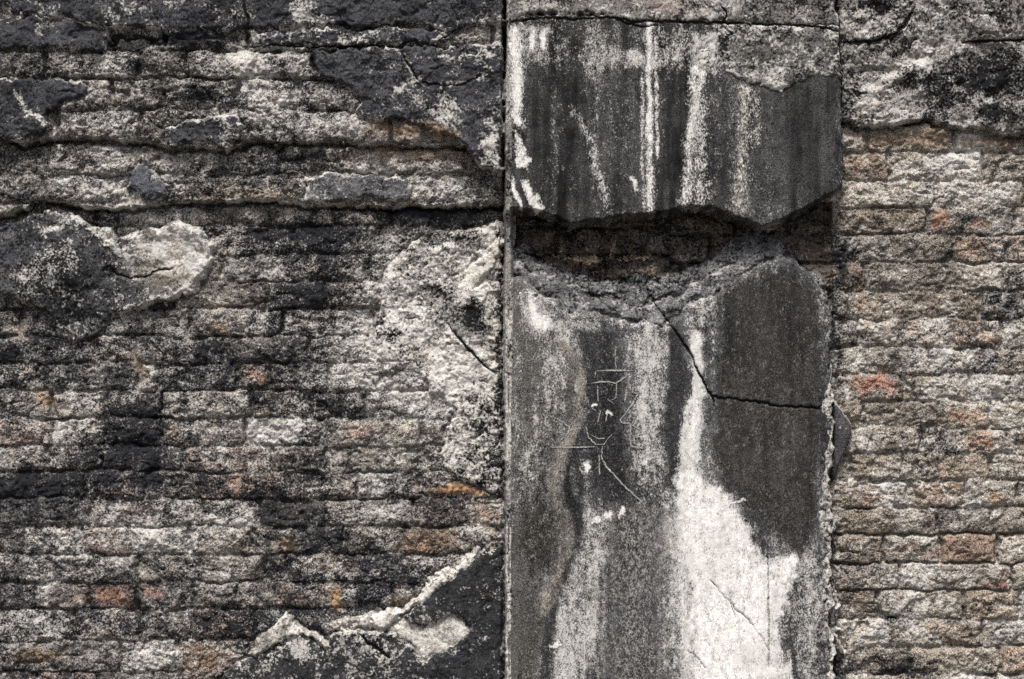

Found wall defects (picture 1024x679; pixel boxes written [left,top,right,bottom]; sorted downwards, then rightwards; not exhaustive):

water stain [504,26,548,215]
water stain [568,106,609,205]
water stain [630,22,660,211]
water stain [677,65,712,209]
water stain [729,84,762,217]
crack [450,326,496,373]
spalling [364,202,832,496]
crack [647,288,820,409]
water stain [512,259,833,679]
flaking render [221,545,505,679]